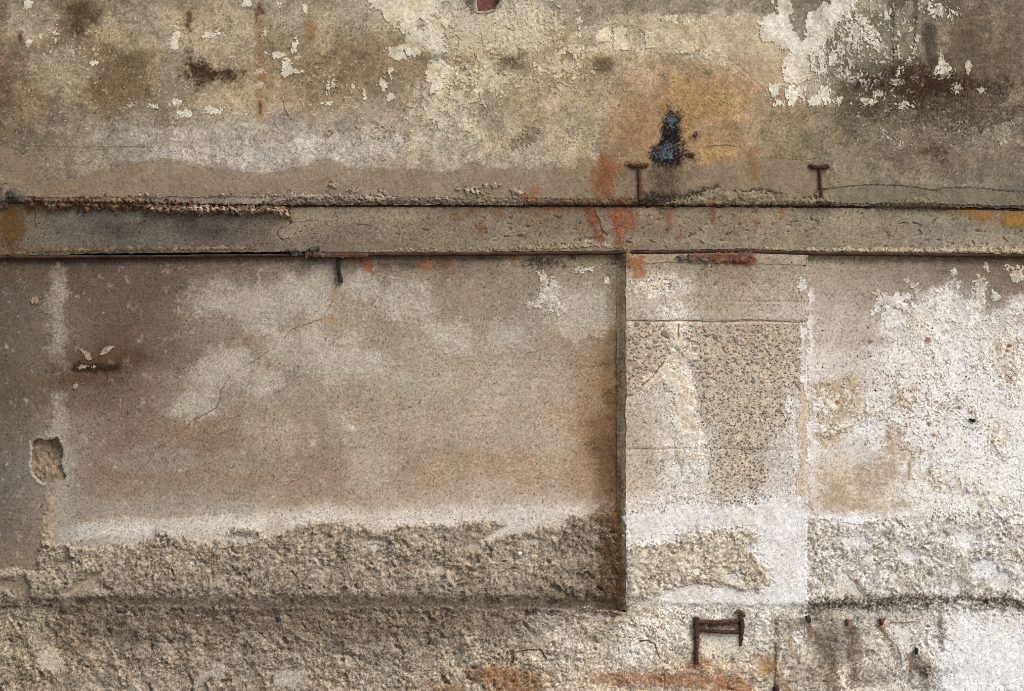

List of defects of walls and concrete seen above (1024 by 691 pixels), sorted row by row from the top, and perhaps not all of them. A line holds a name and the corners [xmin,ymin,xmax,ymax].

leakage [179,50,246,89]
peeling [3,0,1024,163]
spalling [24,179,638,228]
rust [576,155,638,246]
leakage [524,264,610,323]
rust [689,247,773,285]
leakage [72,361,120,373]
crack [136,283,339,474]
spalling [27,434,67,487]
spalling [612,236,1024,655]
leakage [826,457,911,512]
peeling [891,627,919,662]